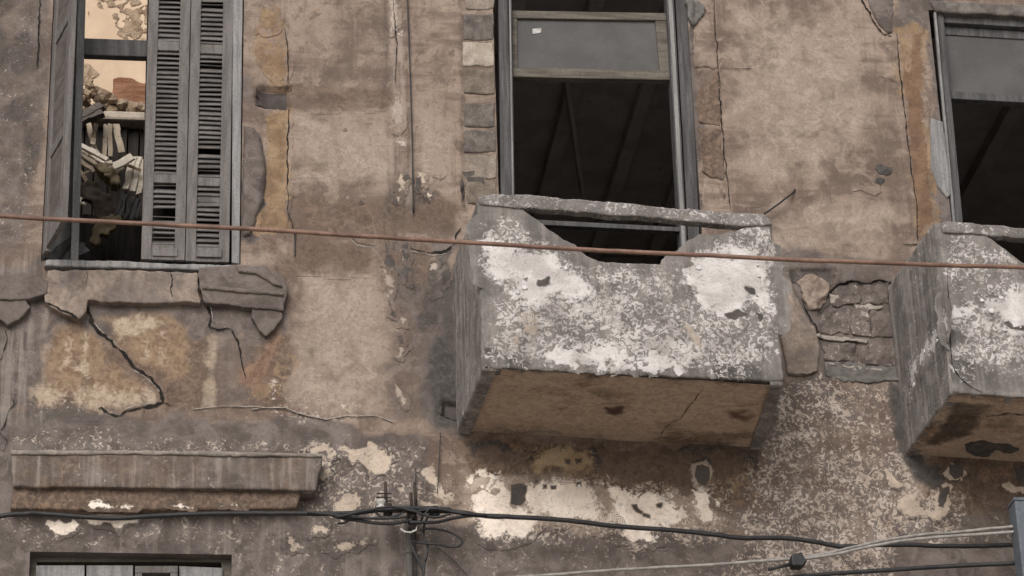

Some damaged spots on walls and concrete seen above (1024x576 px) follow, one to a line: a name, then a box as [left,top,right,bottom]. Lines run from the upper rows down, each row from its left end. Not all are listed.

crack [714,1,753,205]
crack [861,0,918,245]
peeling [459,0,1024,406]
crack [46,267,393,423]
damp [421,280,459,436]
peeling [298,438,404,481]
peeling [417,438,728,552]
damp [880,381,1024,515]